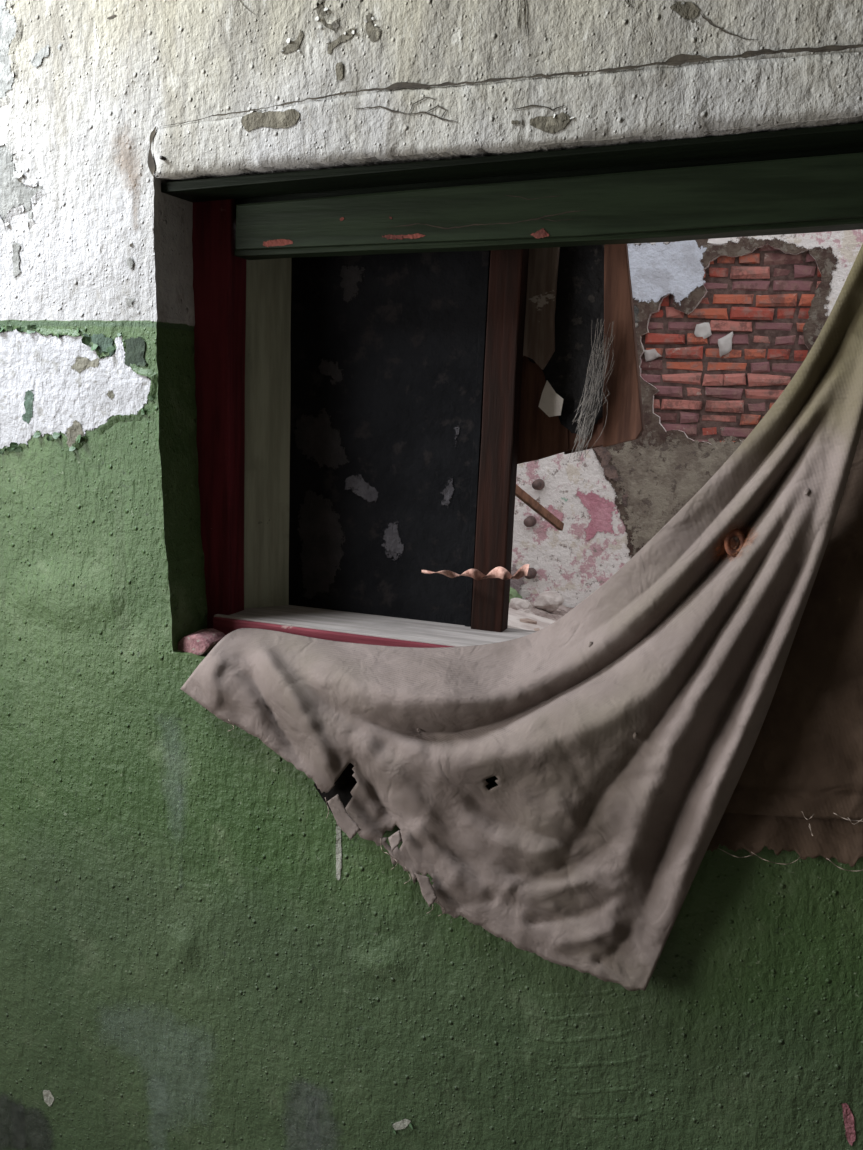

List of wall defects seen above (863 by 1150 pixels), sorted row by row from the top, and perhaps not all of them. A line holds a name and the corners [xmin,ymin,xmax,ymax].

peeling [0,0,61,107]
crack [147,14,863,177]
peeling [0,137,45,278]
peeling [0,324,158,455]
flaking render [543,236,838,558]
peeling [841,1103,856,1146]